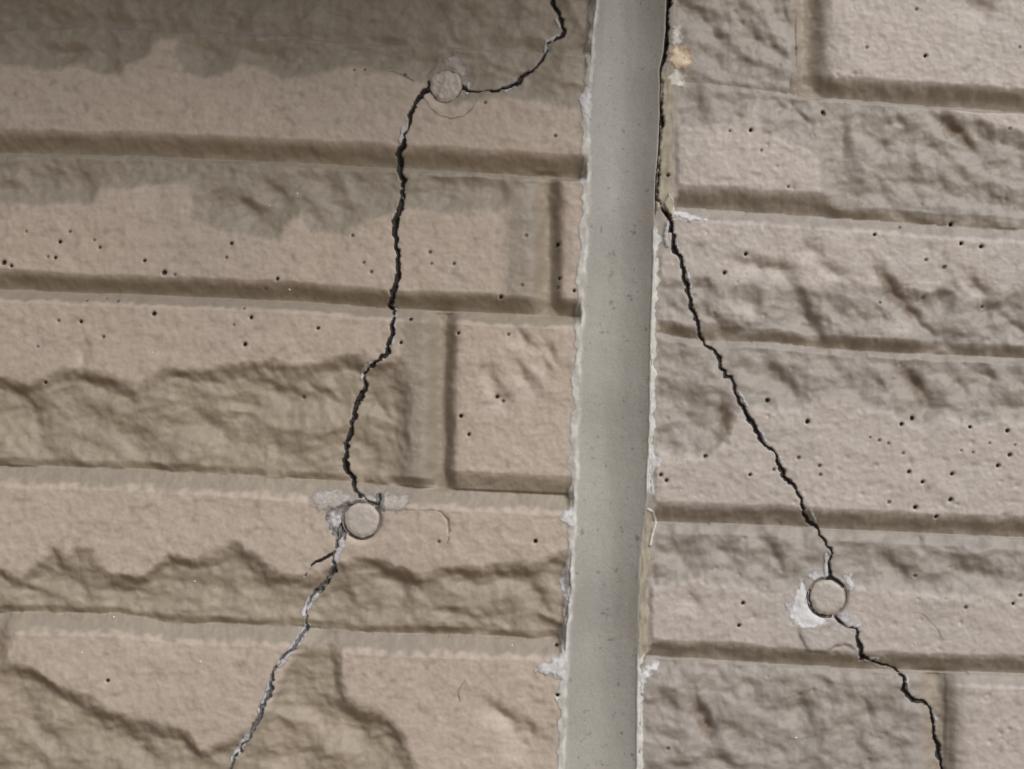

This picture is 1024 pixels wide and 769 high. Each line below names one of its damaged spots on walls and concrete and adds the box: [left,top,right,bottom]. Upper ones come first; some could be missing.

crack [343,0,567,543]
crack [655,0,842,586]
crack [229,525,345,769]
crack [834,616,943,769]